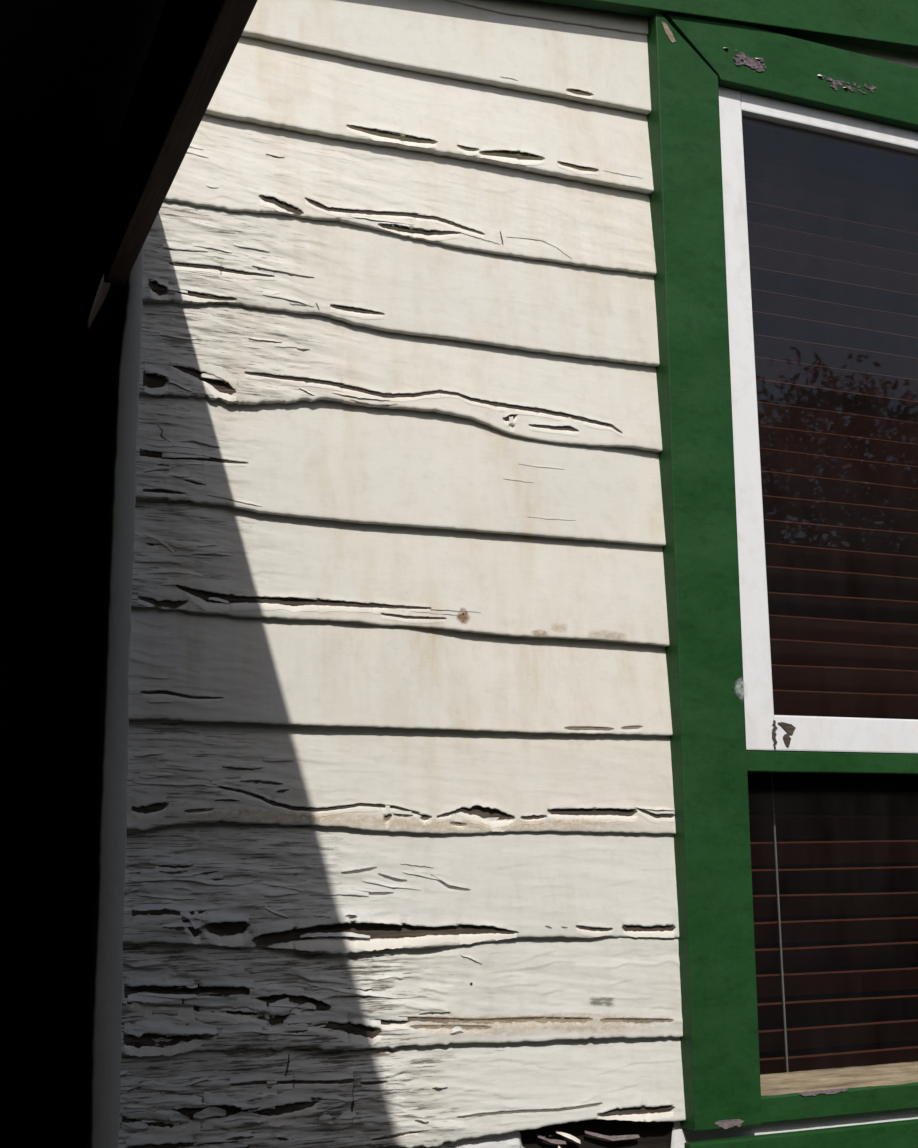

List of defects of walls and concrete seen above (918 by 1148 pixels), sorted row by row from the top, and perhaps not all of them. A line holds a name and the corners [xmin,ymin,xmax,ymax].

peeling [724,47,767,72]
peeling [818,74,876,93]
crack [462,231,570,258]
crack [411,608,480,616]
peeling [222,754,674,832]
peeling [131,859,516,947]
peeling [545,913,676,938]
peeling [124,967,674,1037]
peeling [123,1071,356,1148]
peeling [371,1115,431,1144]
hole [519,1092,675,1148]
peeling [715,1119,744,1129]